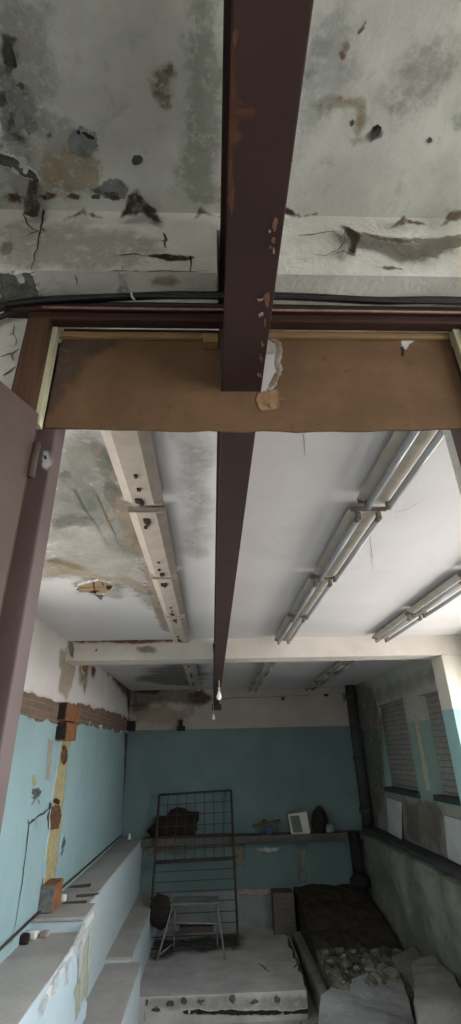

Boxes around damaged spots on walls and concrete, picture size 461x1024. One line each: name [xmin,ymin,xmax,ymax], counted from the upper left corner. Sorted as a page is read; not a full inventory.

damp [153,65,173,105]
spalling [67,126,98,166]
corrosion [227,29,255,218]
spalling [92,179,128,199]
crack [26,210,49,285]
crack [75,233,210,285]
crack [0,324,19,376]
damp [42,437,169,631]
spalling [74,579,117,601]
spalling [68,641,89,675]
spalling [19,689,131,735]
damp [108,665,211,724]